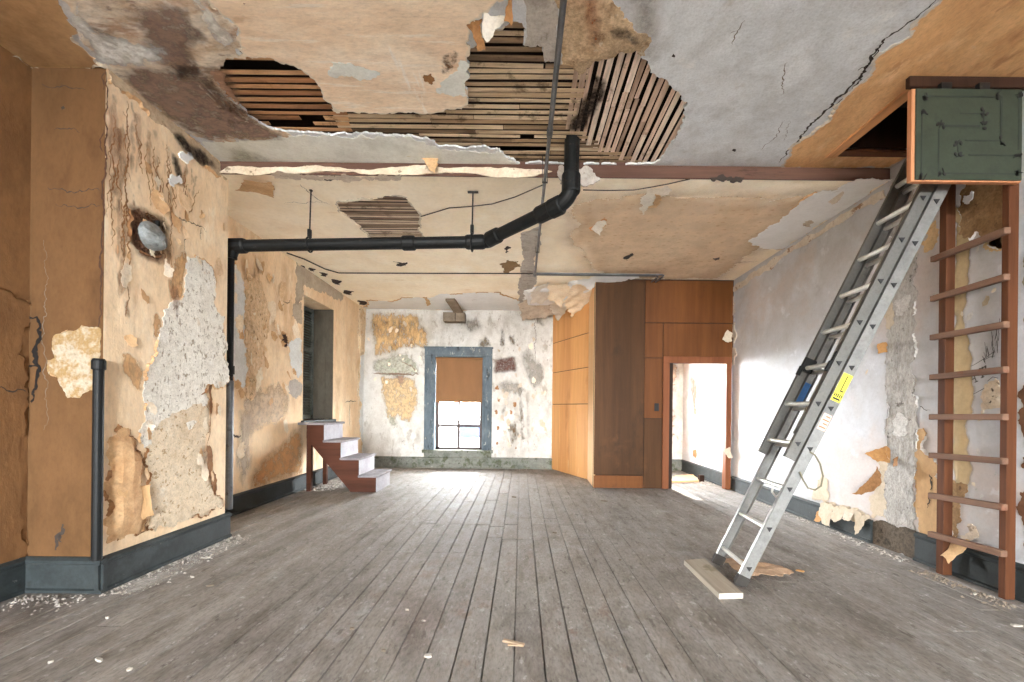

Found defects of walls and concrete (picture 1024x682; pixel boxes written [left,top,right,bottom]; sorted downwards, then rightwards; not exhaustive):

damp [62,0,291,316]
flaking render [202,133,517,164]
flaking render [423,60,470,97]
spalling [554,0,652,75]
flaking render [748,178,894,250]
crack [762,0,936,161]
crack [1,240,49,428]
spalling [47,325,102,398]
spalling [137,161,303,532]
flaking render [357,276,639,453]
spalling [883,220,939,530]
peeling [814,505,864,534]